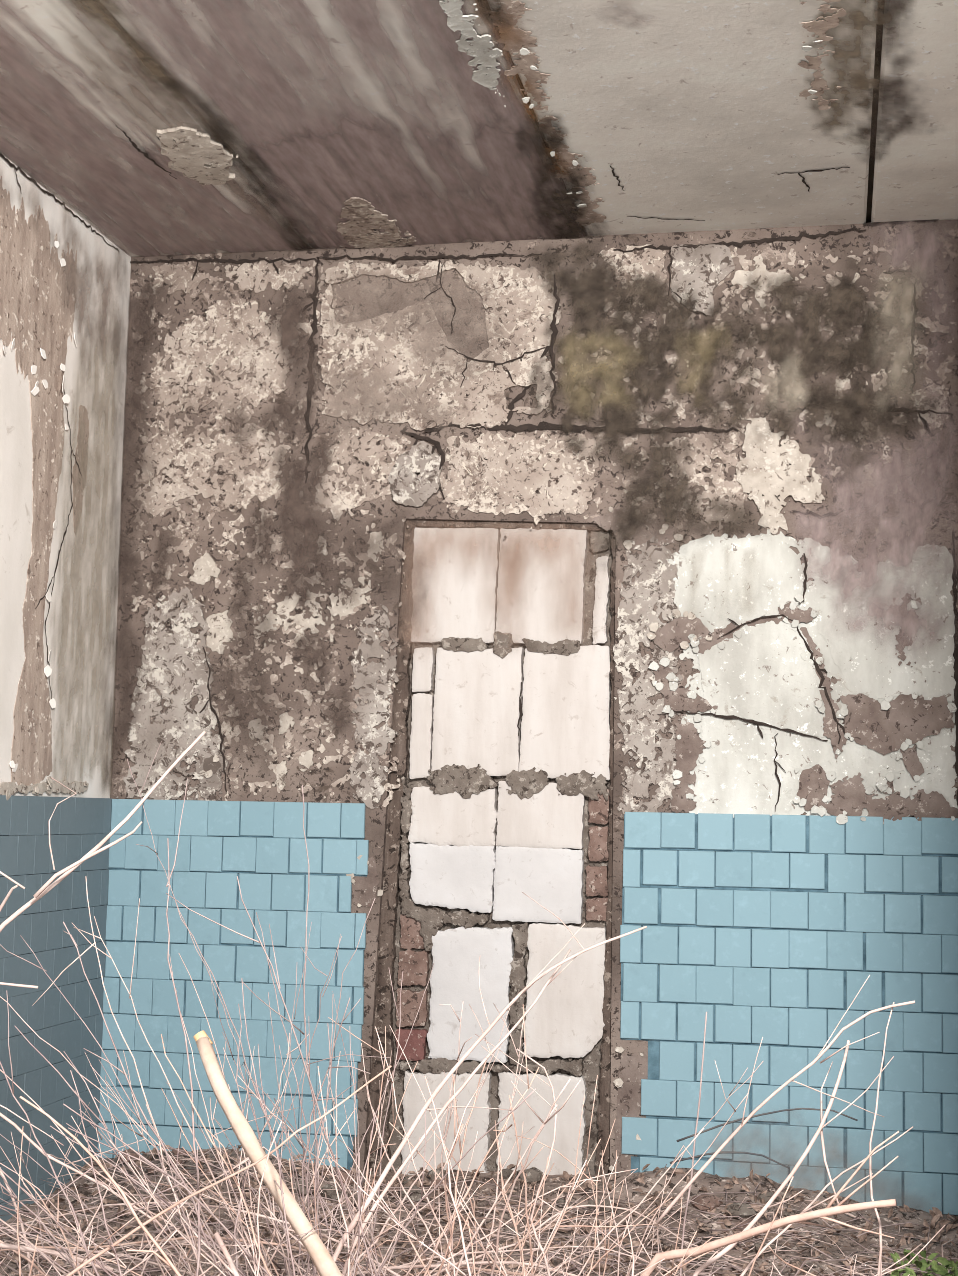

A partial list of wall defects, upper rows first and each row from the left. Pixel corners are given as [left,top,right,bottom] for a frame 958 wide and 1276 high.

crack [116,125,199,182]
crack [0,153,739,500]
damp [0,0,958,602]
peeling [439,0,606,226]
crack [610,166,939,317]
crack [863,269,953,433]
peeling [0,176,89,800]
damp [55,232,155,783]
crack [793,503,863,519]
damp [297,638,325,663]
crack [673,553,849,811]
crack [950,532,958,806]